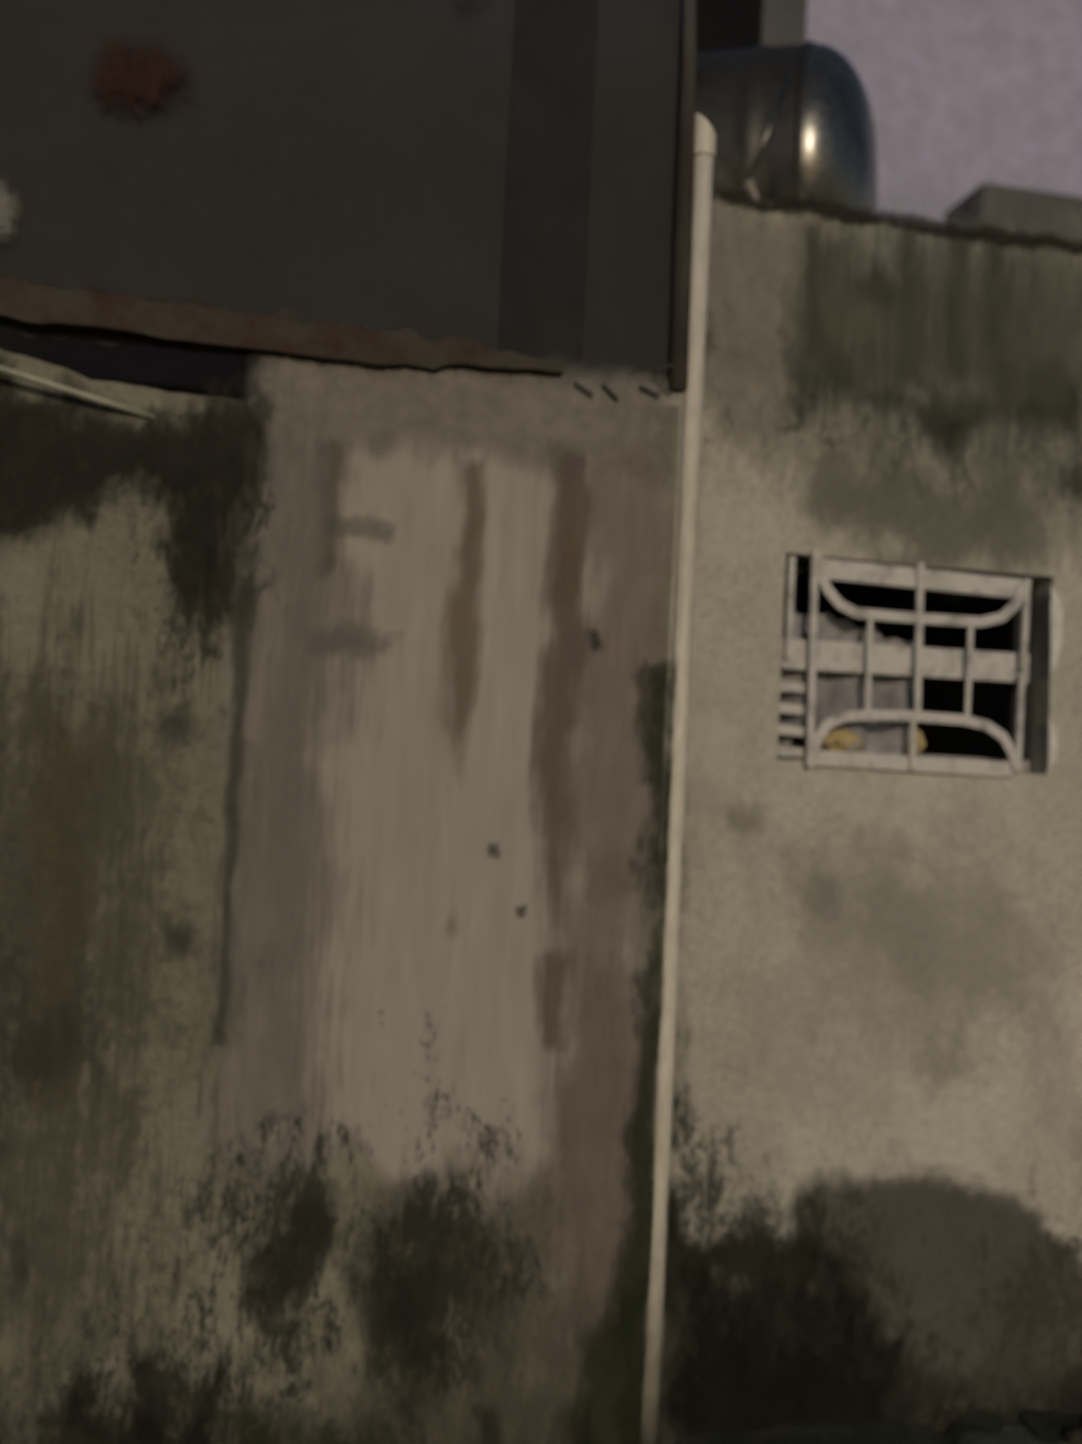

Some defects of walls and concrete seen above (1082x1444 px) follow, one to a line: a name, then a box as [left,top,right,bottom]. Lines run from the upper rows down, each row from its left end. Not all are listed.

damp [712,190,1082,376]
damp [0,357,274,1040]
damp [314,464,656,1444]
damp [0,1288,288,1444]
damp [185,1125,350,1397]
damp [658,1087,1082,1438]